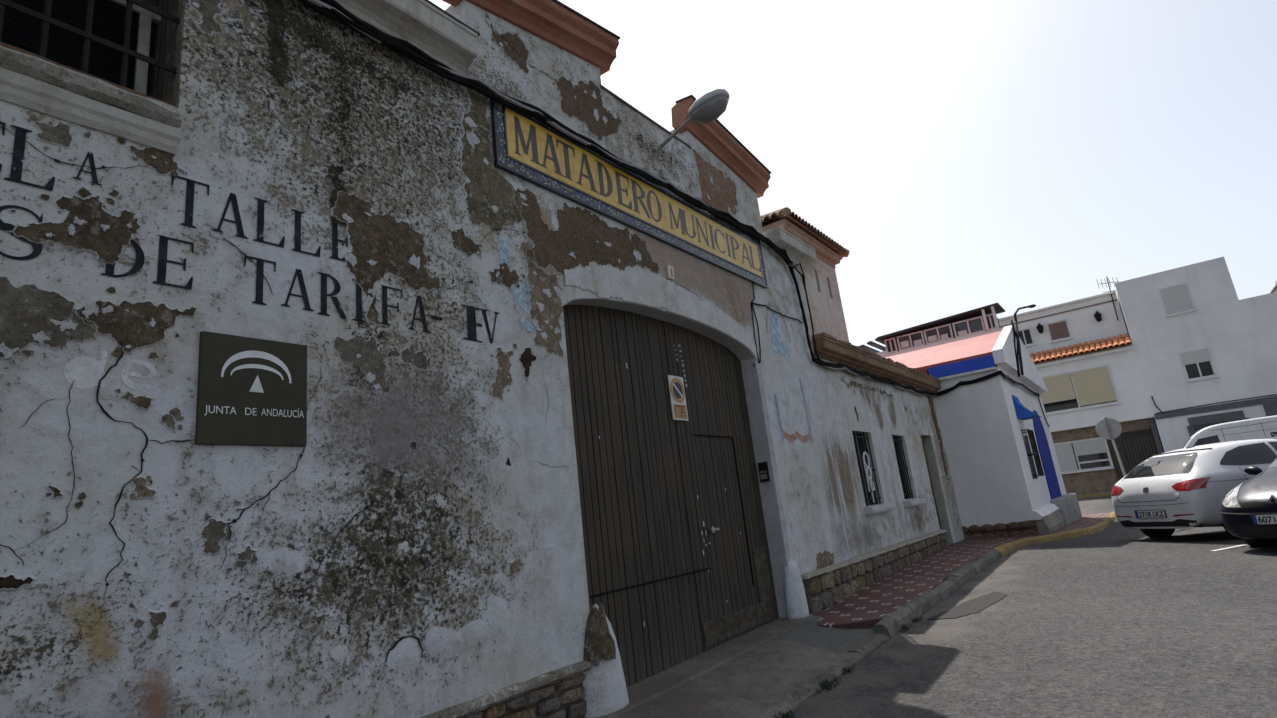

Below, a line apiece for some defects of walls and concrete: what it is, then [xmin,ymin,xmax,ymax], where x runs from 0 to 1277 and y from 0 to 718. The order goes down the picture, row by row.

mould [248,0,423,228]
peeling [553,71,622,141]
peeling [6,187,145,265]
peeling [0,275,197,366]
damp [345,296,390,357]
peeling [330,186,446,392]
peeling [446,87,660,401]
peeling [692,148,740,215]
crack [0,341,194,600]
peeling [116,389,184,433]
crack [218,446,305,570]
damp [183,363,479,647]